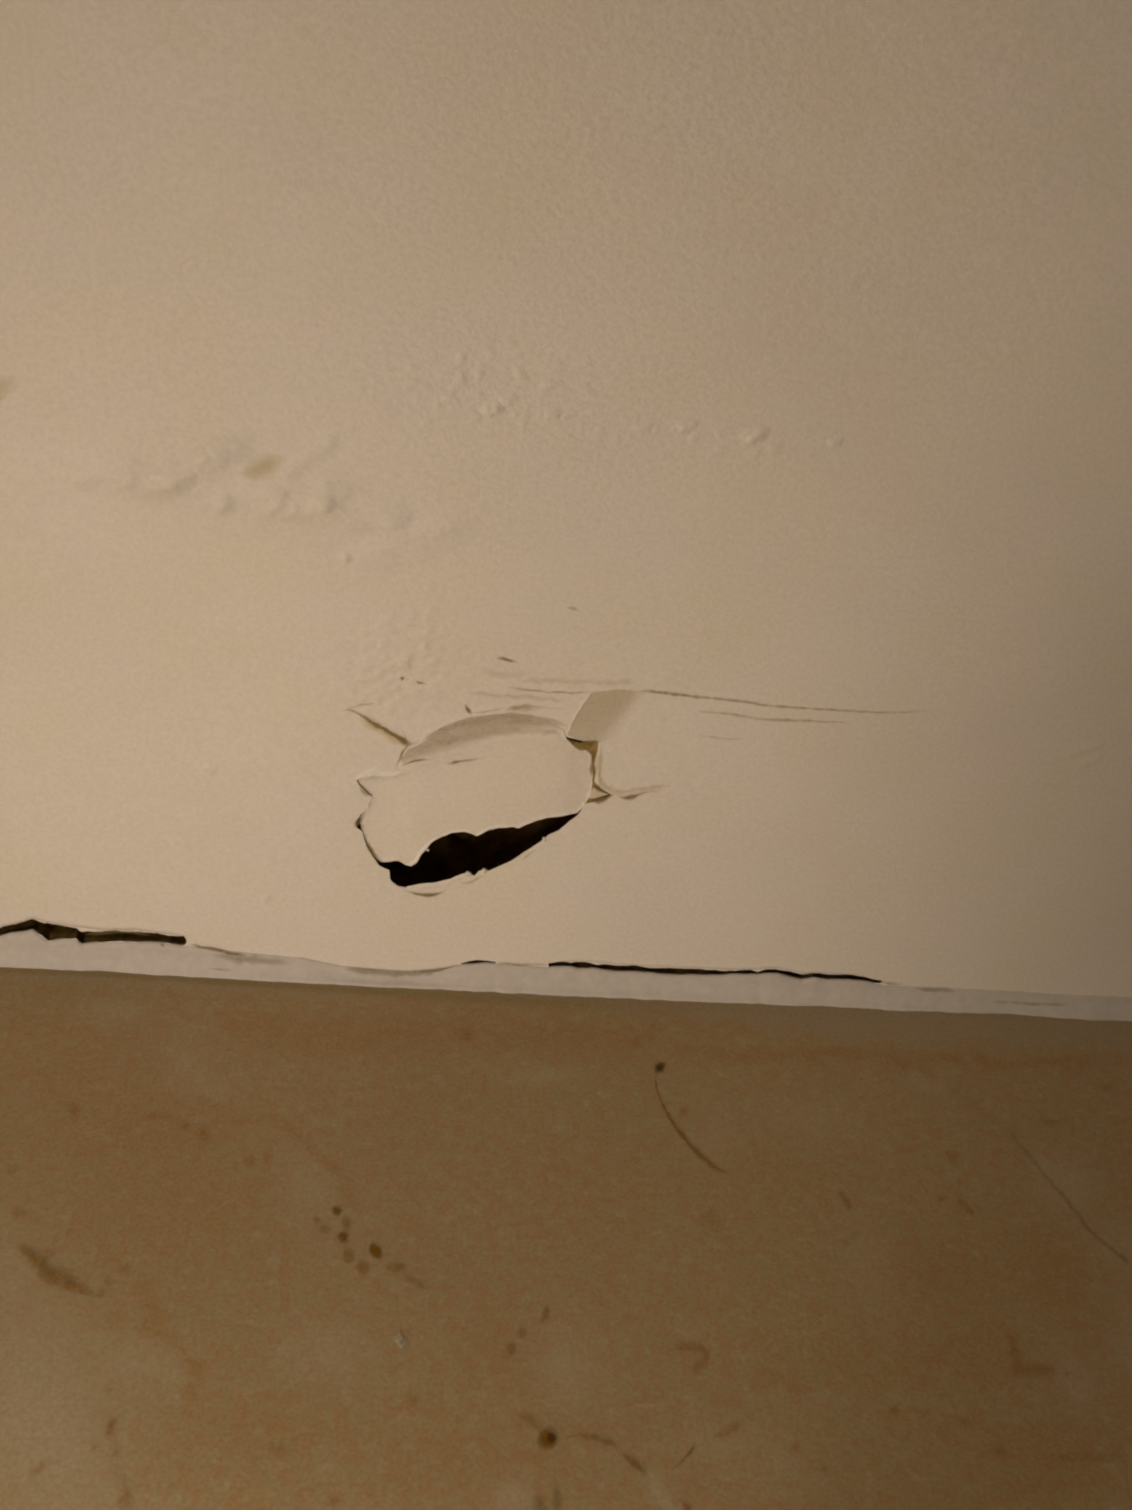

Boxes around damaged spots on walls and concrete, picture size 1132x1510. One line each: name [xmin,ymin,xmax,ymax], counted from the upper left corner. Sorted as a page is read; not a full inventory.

spalling [355,690,638,897]
crack [0,909,238,955]
crack [423,960,493,972]
crack [548,956,882,983]